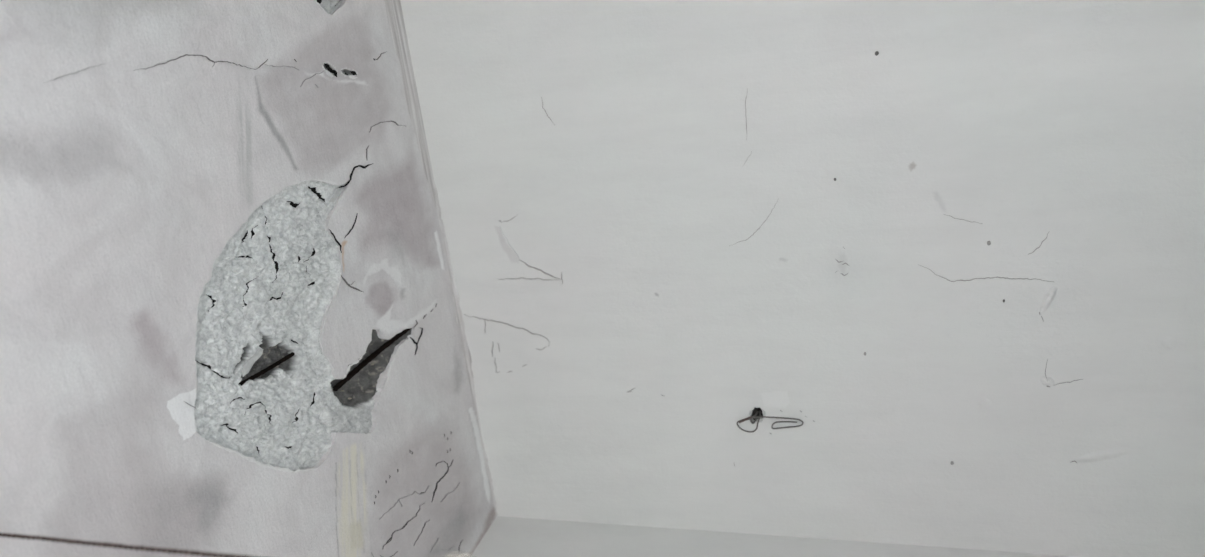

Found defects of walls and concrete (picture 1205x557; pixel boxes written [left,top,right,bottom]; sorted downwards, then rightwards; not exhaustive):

spalling [314,0,343,14]
crack [45,63,105,83]
crack [133,54,325,88]
crack [339,121,405,188]
crack [329,213,363,292]
spalling [194,179,416,473]
crack [371,460,463,557]